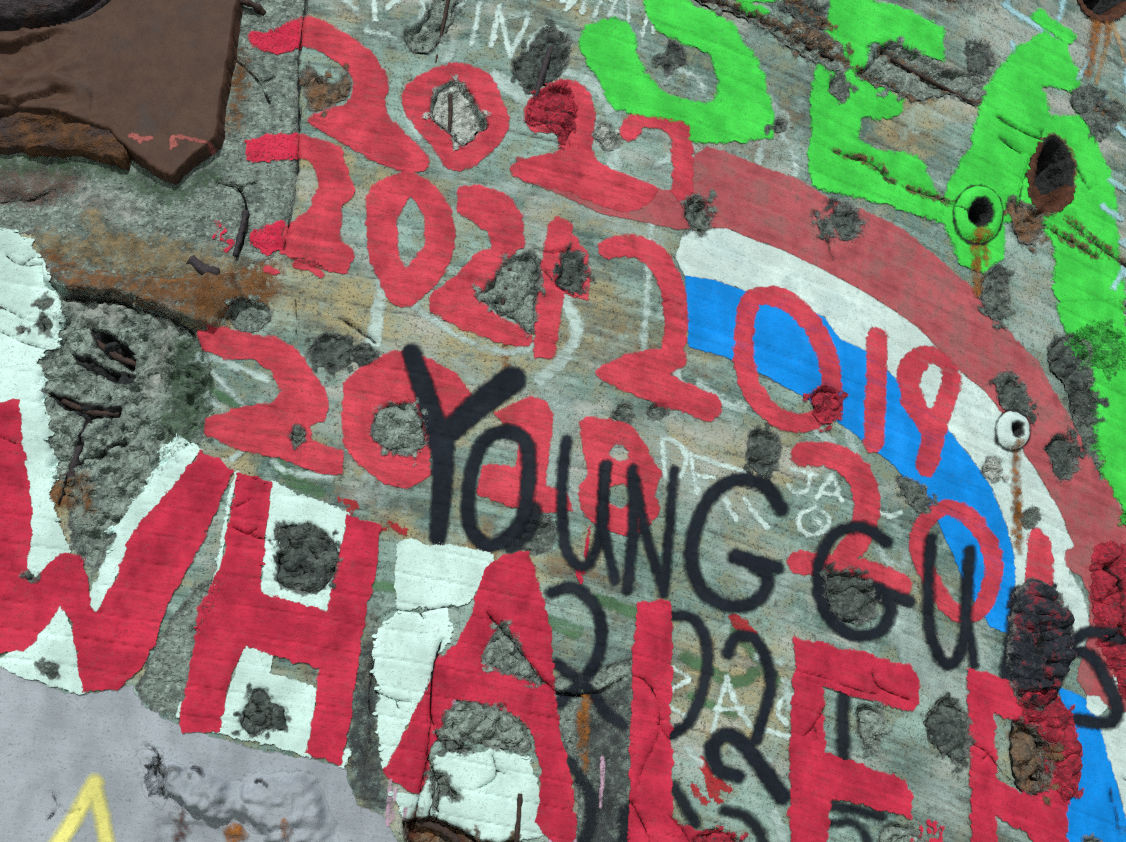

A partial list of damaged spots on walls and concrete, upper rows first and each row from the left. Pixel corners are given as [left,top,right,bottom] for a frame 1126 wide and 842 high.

rust [1084,20,1111,78]
rust [0,110,132,206]
spalling [423,74,491,150]
rust [41,209,284,327]
spalling [0,0,351,573]
spalling [472,242,596,340]
rust [971,226,993,296]
rust [1011,439,1024,552]
spalling [259,522,341,595]
spalling [214,683,291,739]
spalling [482,621,635,842]
spalling [1006,578,1084,806]